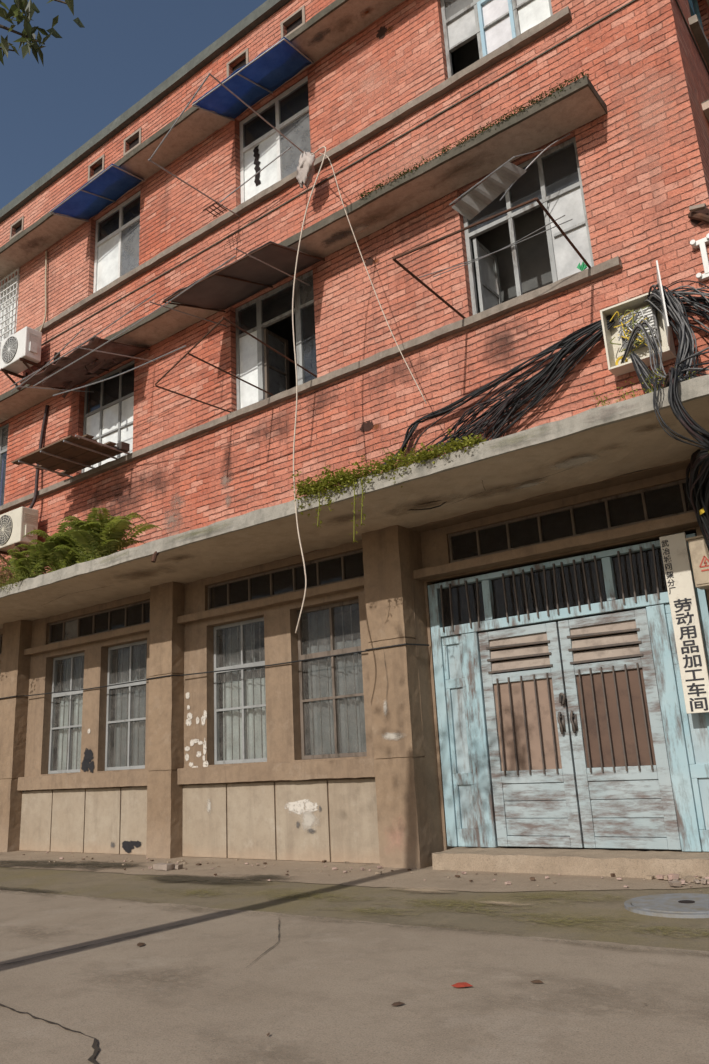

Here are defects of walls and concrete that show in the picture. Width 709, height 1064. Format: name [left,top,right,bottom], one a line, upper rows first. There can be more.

peeling [186,692,207,726]
peeling [185,739,208,768]
crack [0,1003,94,1038]